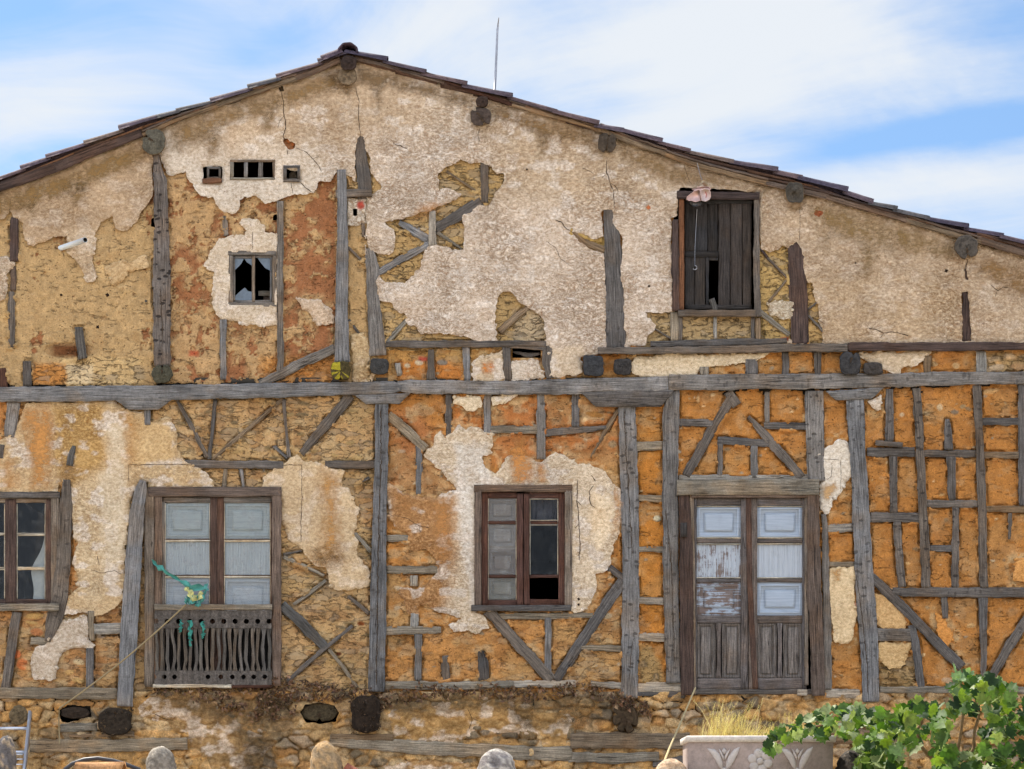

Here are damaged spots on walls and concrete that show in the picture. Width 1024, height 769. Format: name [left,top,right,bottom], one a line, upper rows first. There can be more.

crack [278,91,321,192]
spalling [0,154,583,387]
flaking render [857,351,931,374]
flaking render [452,394,518,411]
flaking render [867,395,883,411]
flaking render [818,439,851,514]
flaking render [0,400,215,681]
flaking render [262,455,370,591]
flaking render [387,424,622,634]
flaking render [829,566,857,644]
flaking render [874,593,911,669]
flaking render [935,612,955,646]